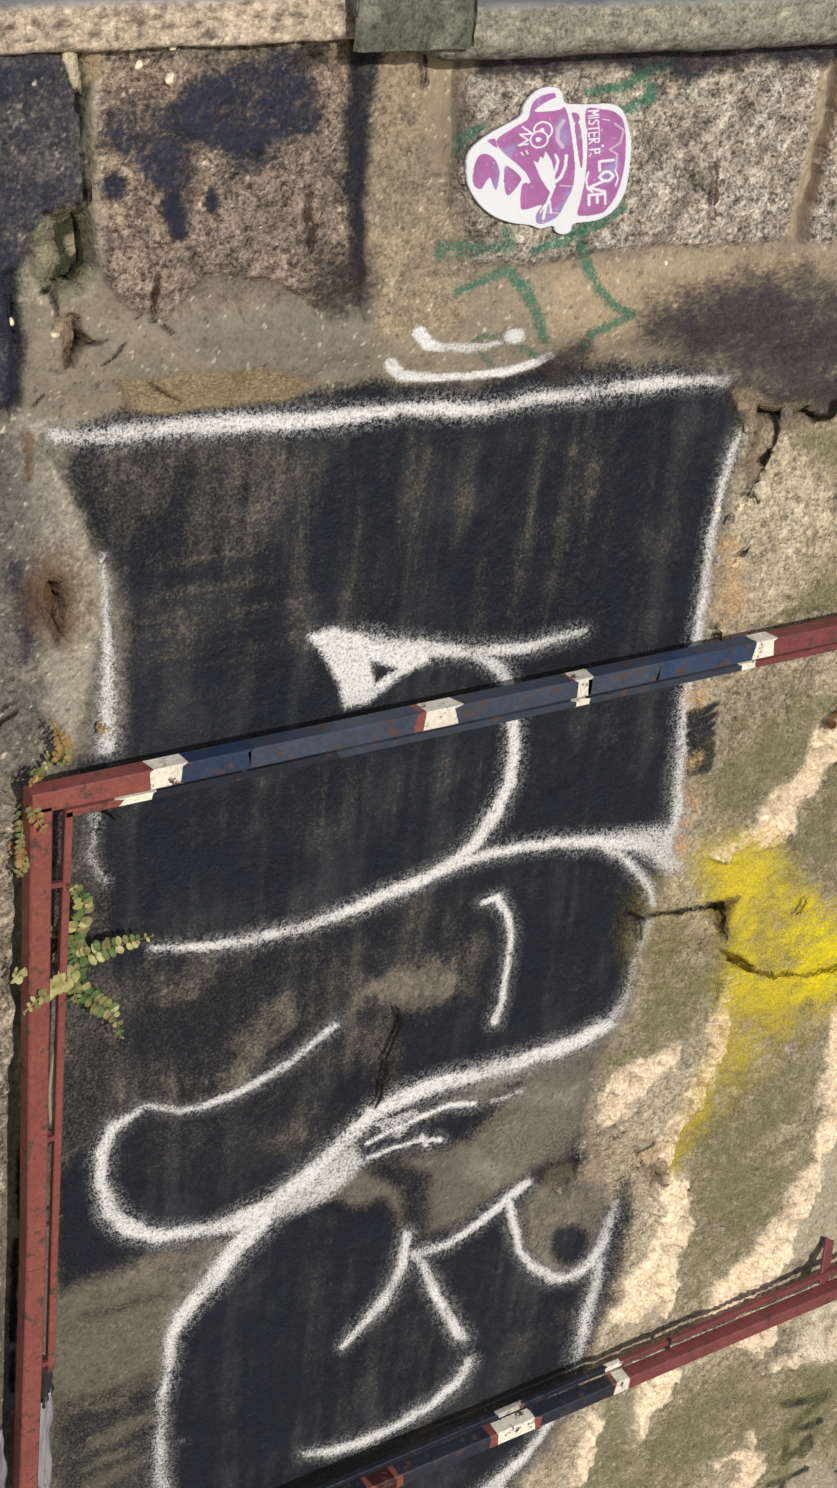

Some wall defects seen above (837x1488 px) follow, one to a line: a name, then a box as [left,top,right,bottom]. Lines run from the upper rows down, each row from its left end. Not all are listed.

spalling [29,205,97,369]
crack [714,400,837,568]
spalling [38,574,76,647]
crack [713,624,723,641]
crack [629,902,837,980]
crack [374,1004,404,1110]